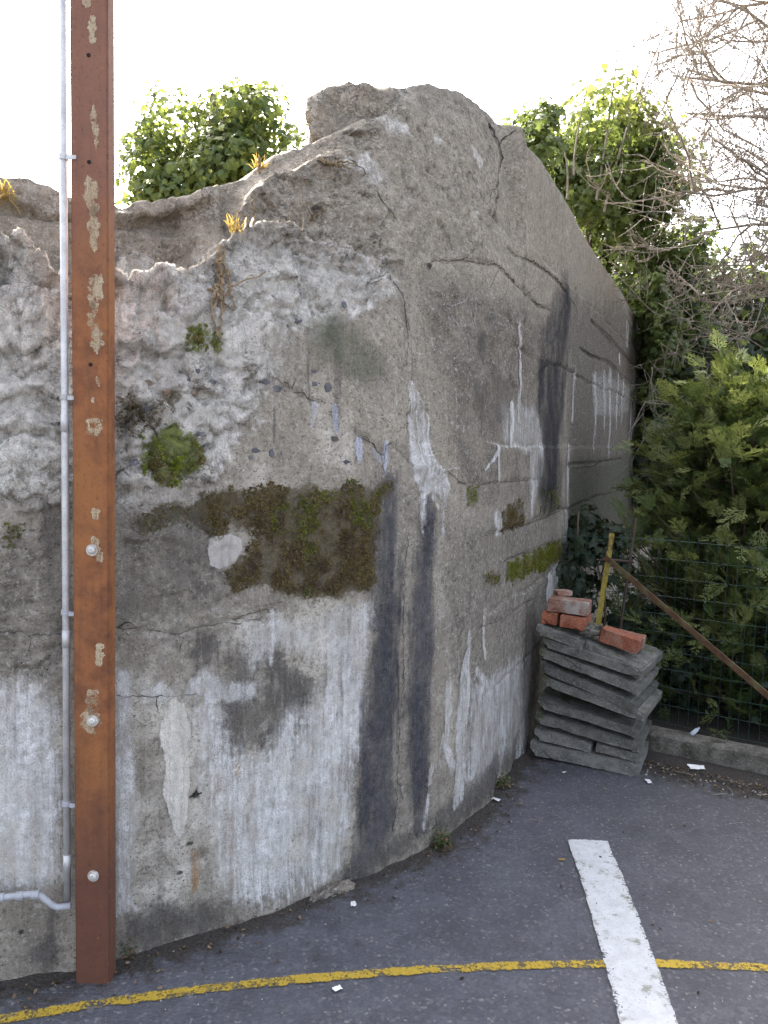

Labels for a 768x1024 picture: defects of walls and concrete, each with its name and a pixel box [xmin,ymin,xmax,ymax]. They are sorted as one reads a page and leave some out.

crack [487,113,516,217]
crack [367,257,417,383]
crack [426,247,639,385]
water stain [531,278,576,601]
water stain [594,324,639,459]
water stain [191,632,314,758]
water stain [346,382,532,880]